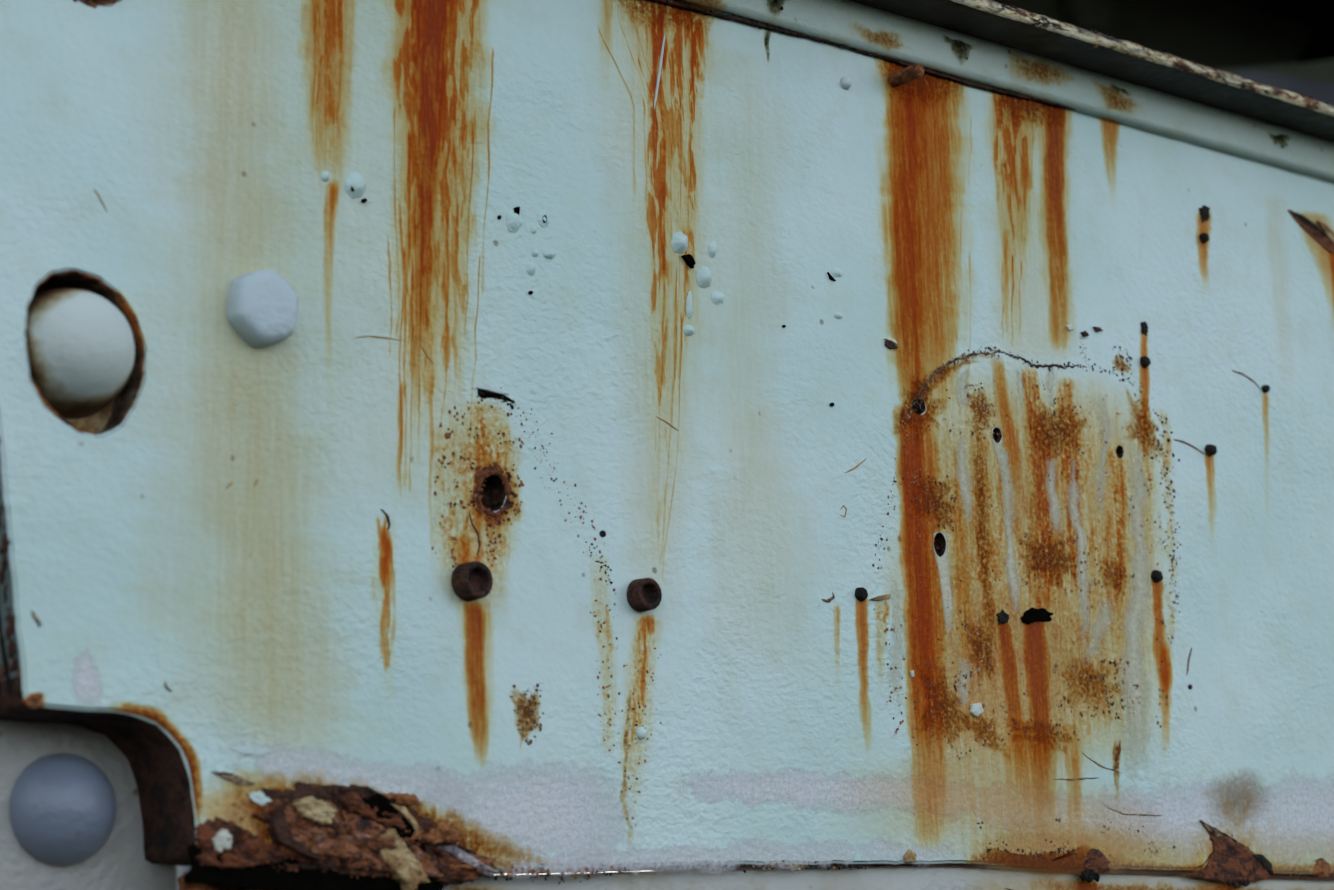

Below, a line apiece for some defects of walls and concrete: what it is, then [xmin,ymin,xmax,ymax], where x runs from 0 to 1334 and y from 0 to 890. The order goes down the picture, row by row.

rust [434,383,662,828]
rust [872,345,1181,769]
rust [127,711,196,799]
rust [177,771,625,890]
rust [903,849,917,863]